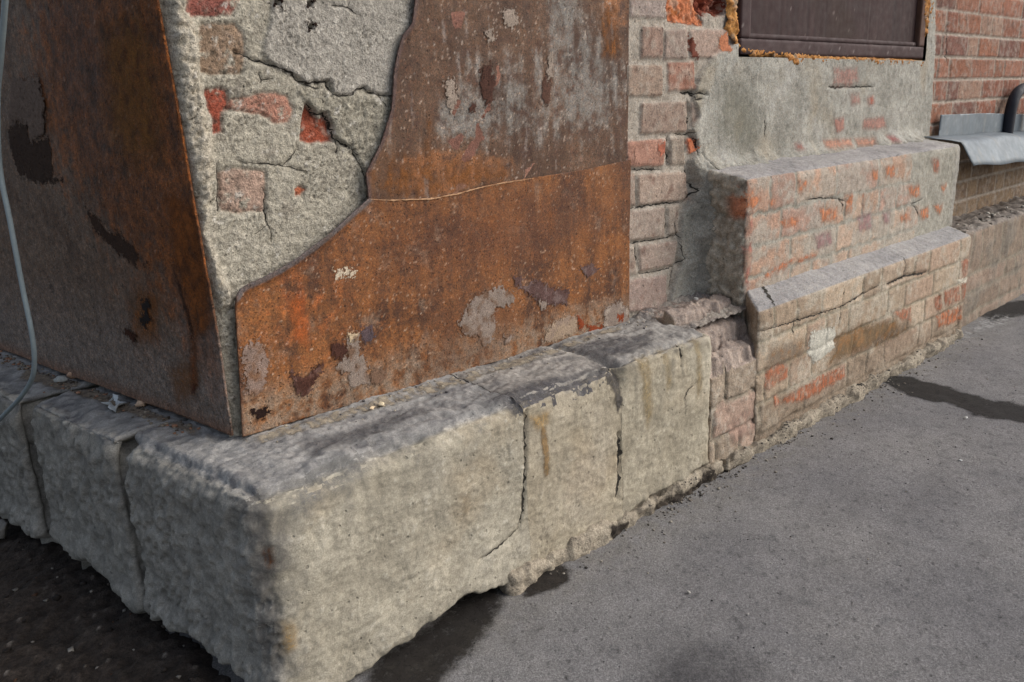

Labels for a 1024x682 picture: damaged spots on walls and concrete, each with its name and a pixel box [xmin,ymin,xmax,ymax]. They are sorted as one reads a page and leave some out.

spalling [665,0,726,60]
crack [234,52,392,179]
rust [467,60,496,114]
rust [538,75,552,107]
crack [241,150,307,247]
rust [85,206,151,268]
peeling [333,266,358,280]
peeling [457,285,518,349]
rust [286,339,348,398]
leakage [257,327,652,512]
crack [481,409,527,558]
crack [614,433,622,497]